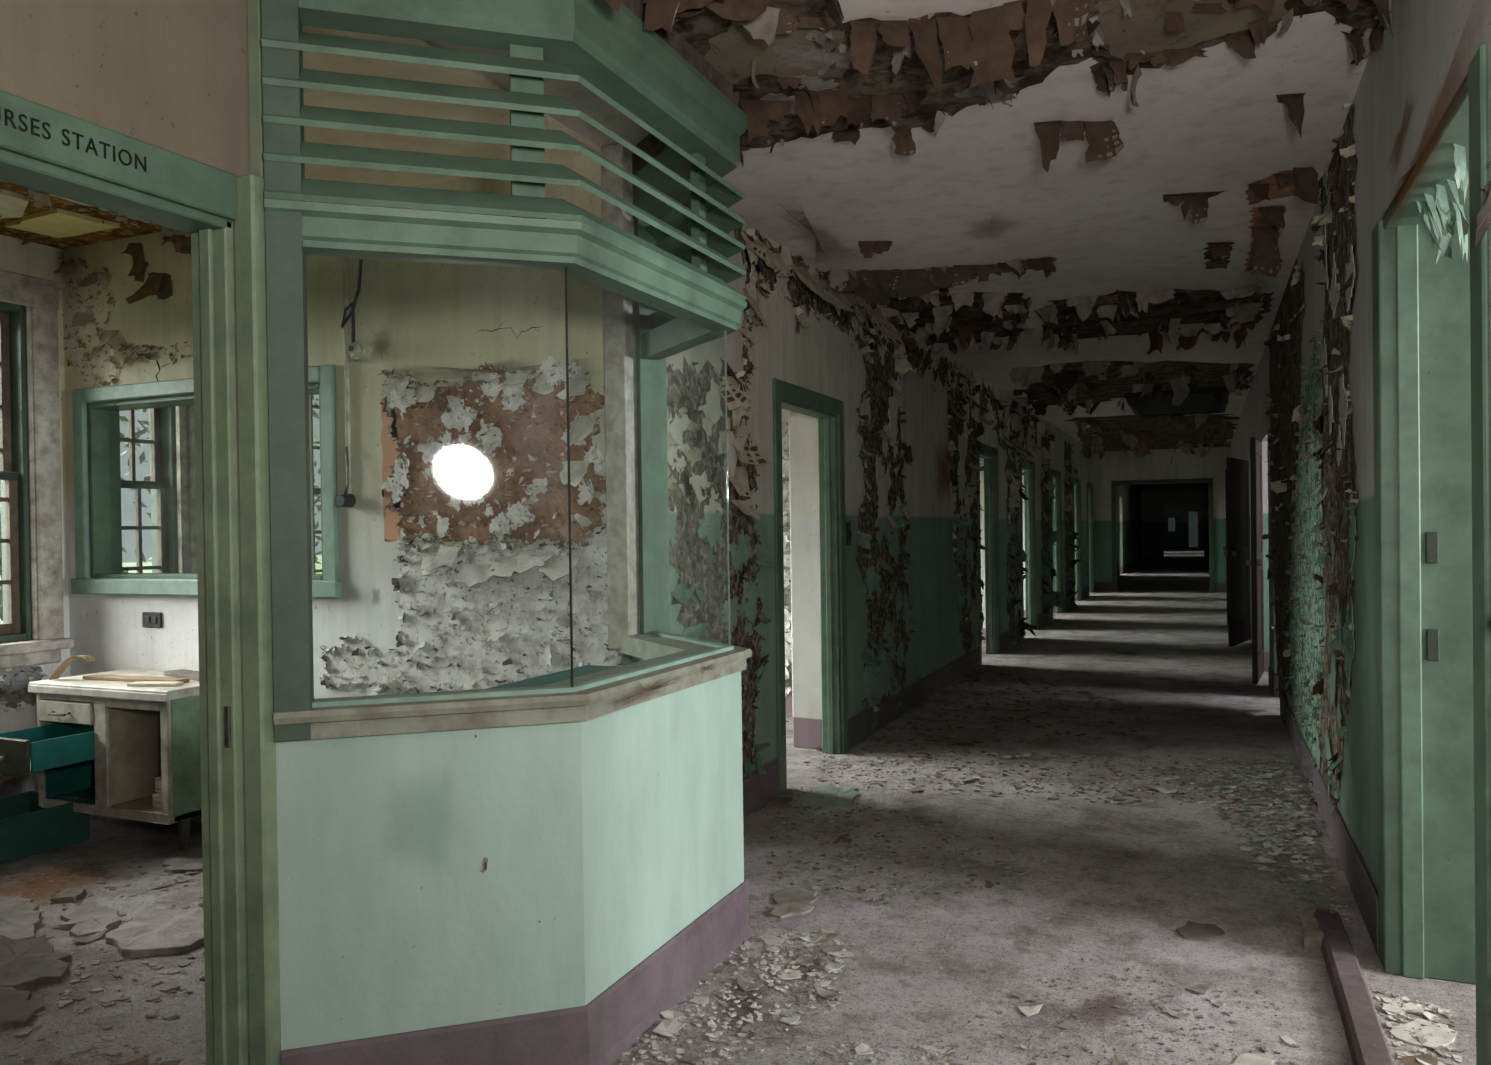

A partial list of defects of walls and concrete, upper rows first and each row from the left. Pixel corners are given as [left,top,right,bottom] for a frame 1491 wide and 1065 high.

peeling [643,0,1394,167]
peeling [0,181,193,388]
peeling [1475,161,1491,246]
peeling [320,356,623,696]
peeling [666,100,1359,828]
peeling [0,665,47,712]